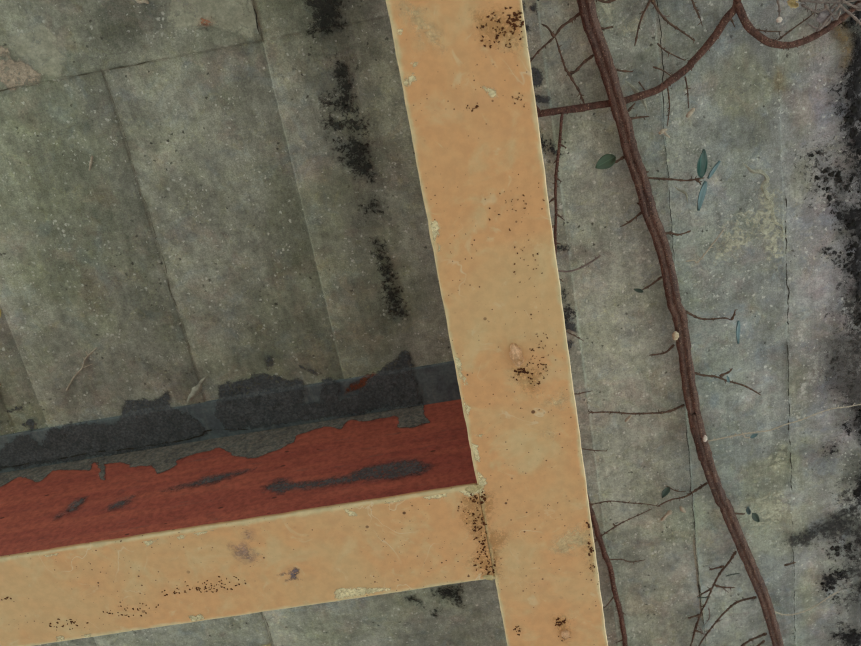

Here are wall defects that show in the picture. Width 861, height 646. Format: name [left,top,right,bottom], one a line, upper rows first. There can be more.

leakage [304,0,348,39]
leakage [531,67,550,103]
leakage [318,53,377,183]
leakage [540,131,562,158]
leakage [782,0,861,460]
leakage [369,237,409,320]
leakage [561,288,577,350]
crack [784,192,792,489]
peeling [460,434,487,496]
leakage [784,468,861,604]
leakage [404,583,465,617]
mould [828,627,861,646]